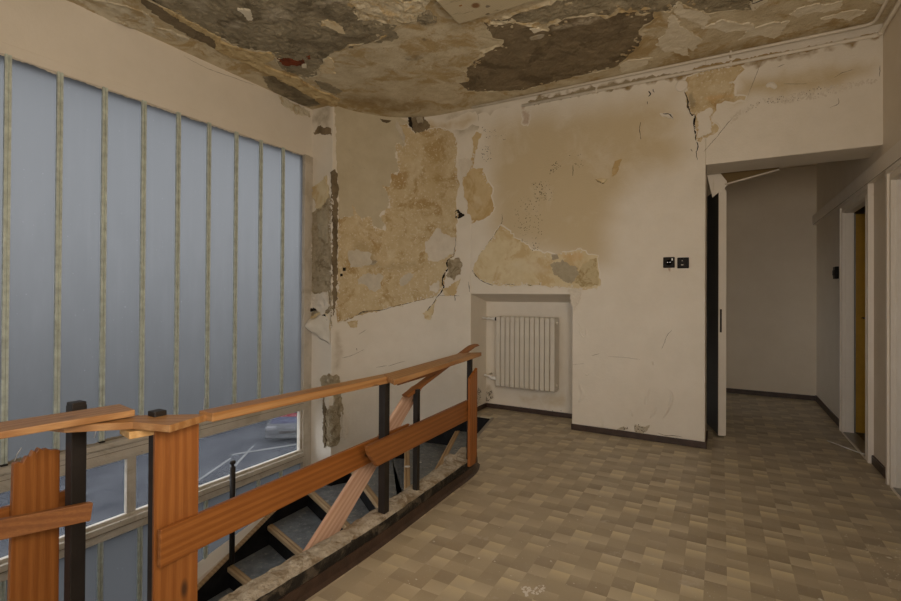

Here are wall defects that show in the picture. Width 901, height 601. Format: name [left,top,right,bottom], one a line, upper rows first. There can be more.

flaking render [67,0,400,117]
flaking render [455,0,885,143]
crack [685,93,730,160]
peeling [305,116,495,344]
crack [344,218,540,358]
peeling [473,224,602,311]
flaking render [320,373,348,448]